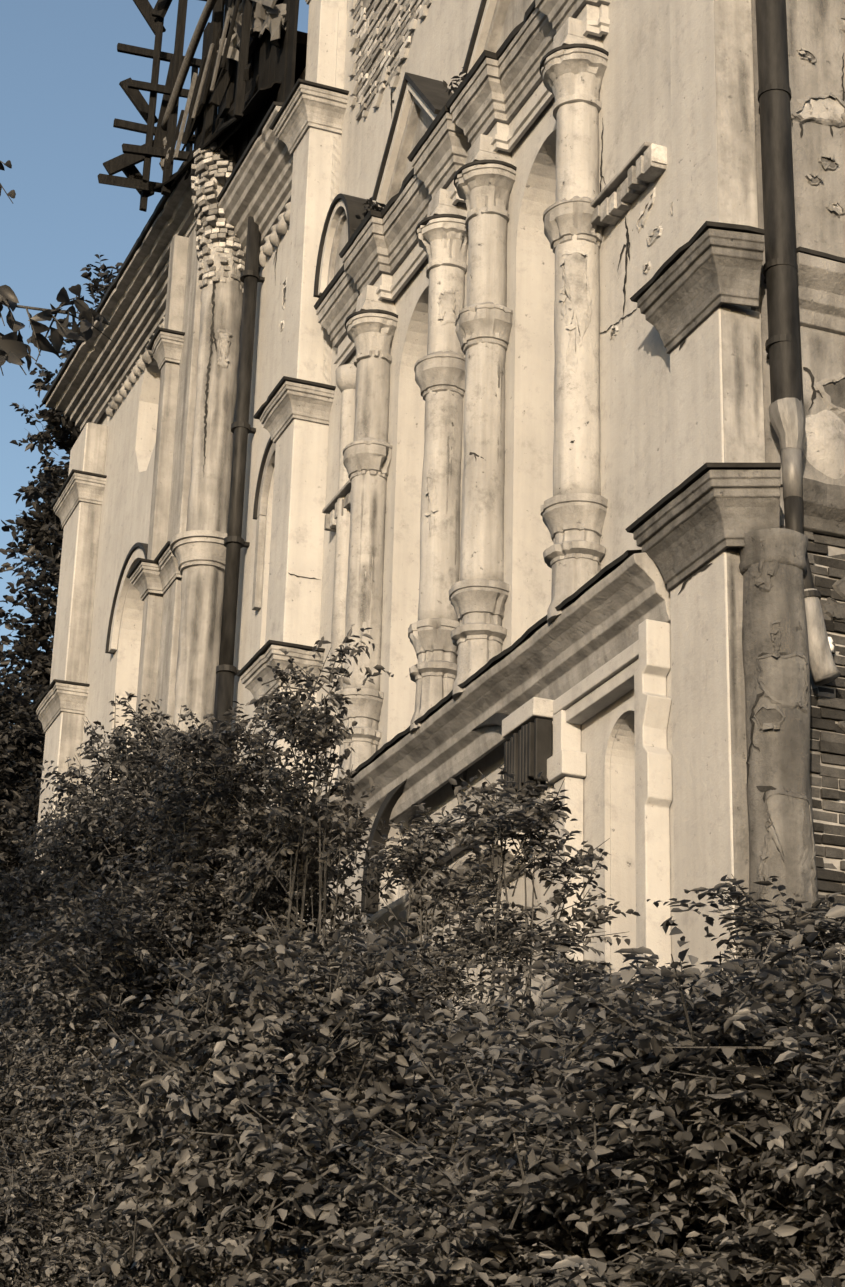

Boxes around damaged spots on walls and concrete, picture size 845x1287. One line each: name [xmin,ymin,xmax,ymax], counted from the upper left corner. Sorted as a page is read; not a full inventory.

spalling [348,0,432,121]
spalling [796,47,817,64]
spalling [791,91,845,127]
spalling [805,154,839,186]
spalling [826,202,845,218]
spalling [815,372,845,417]
spalling [754,621,808,731]
spalling [757,785,818,966]